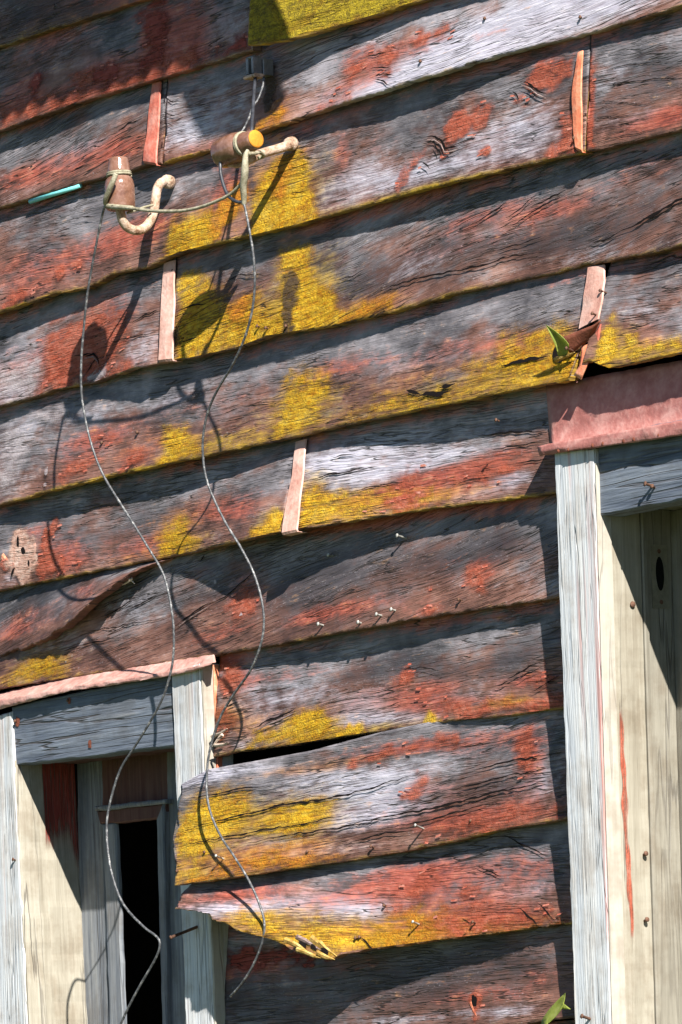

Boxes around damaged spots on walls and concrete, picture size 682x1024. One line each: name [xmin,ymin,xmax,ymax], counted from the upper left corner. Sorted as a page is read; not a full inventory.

crack [335,190,565,297]
crack [592,198,682,243]
peeling [380,464,427,513]
crack [175,753,559,848]
crack [504,835,545,856]
crack [520,903,554,926]